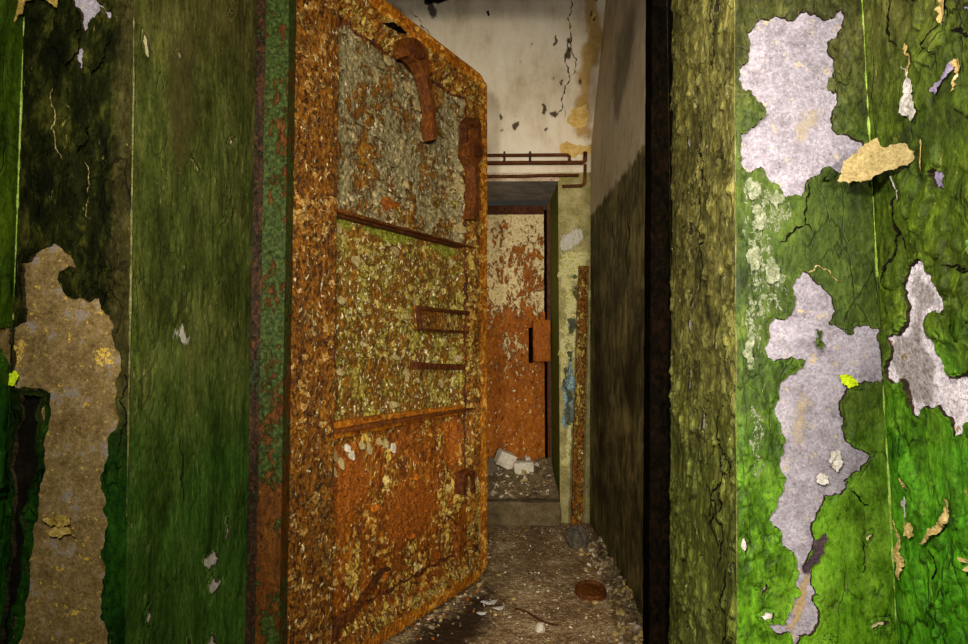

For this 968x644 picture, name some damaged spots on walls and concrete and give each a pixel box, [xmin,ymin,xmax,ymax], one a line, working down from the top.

peeling [14,0,31,36]
peeling [46,0,115,75]
crack [552,1,577,117]
rust [380,197,401,212]
flaking render [0,19,153,644]
peeling [734,0,968,644]
rust [333,453,370,537]
rust [384,480,439,554]